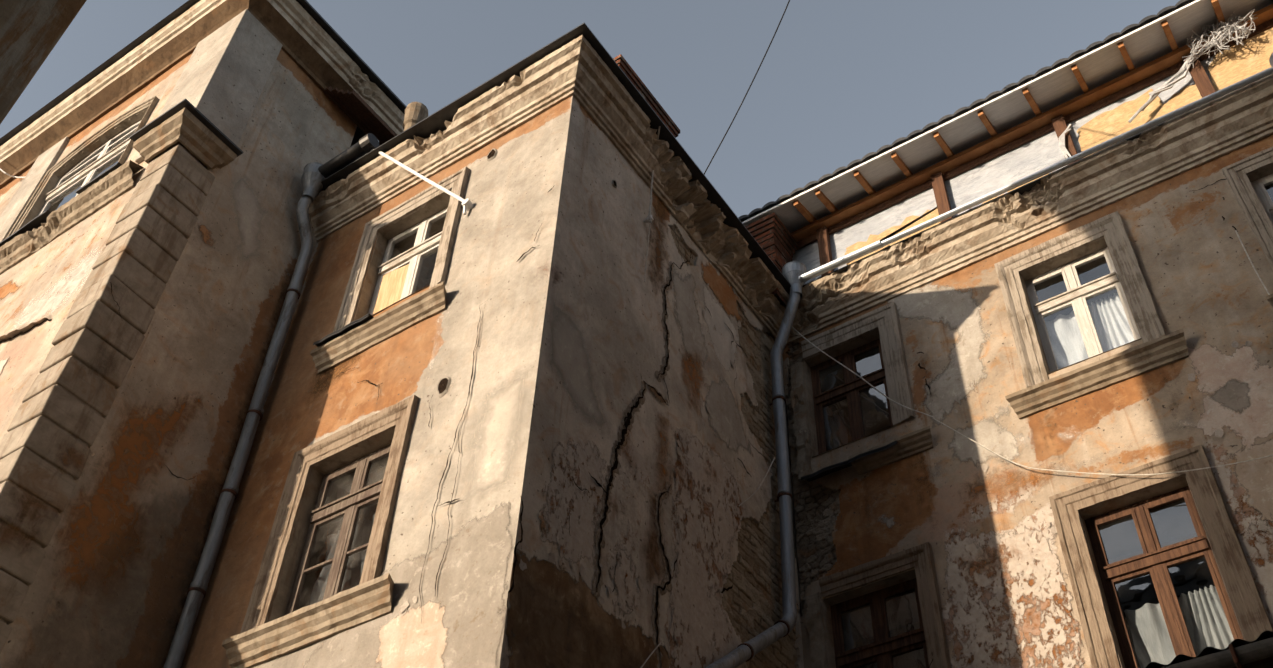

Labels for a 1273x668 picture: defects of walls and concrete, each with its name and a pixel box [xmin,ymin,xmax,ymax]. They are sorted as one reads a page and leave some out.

damp [59,398,201,594]
crack [569,220,701,598]
flaking render [670,225,799,668]
peeling [887,283,990,425]
peeling [1187,341,1273,450]
peeling [376,596,448,668]
crack [651,482,678,668]
peeling [941,521,1091,668]
peeling [1237,520,1273,627]